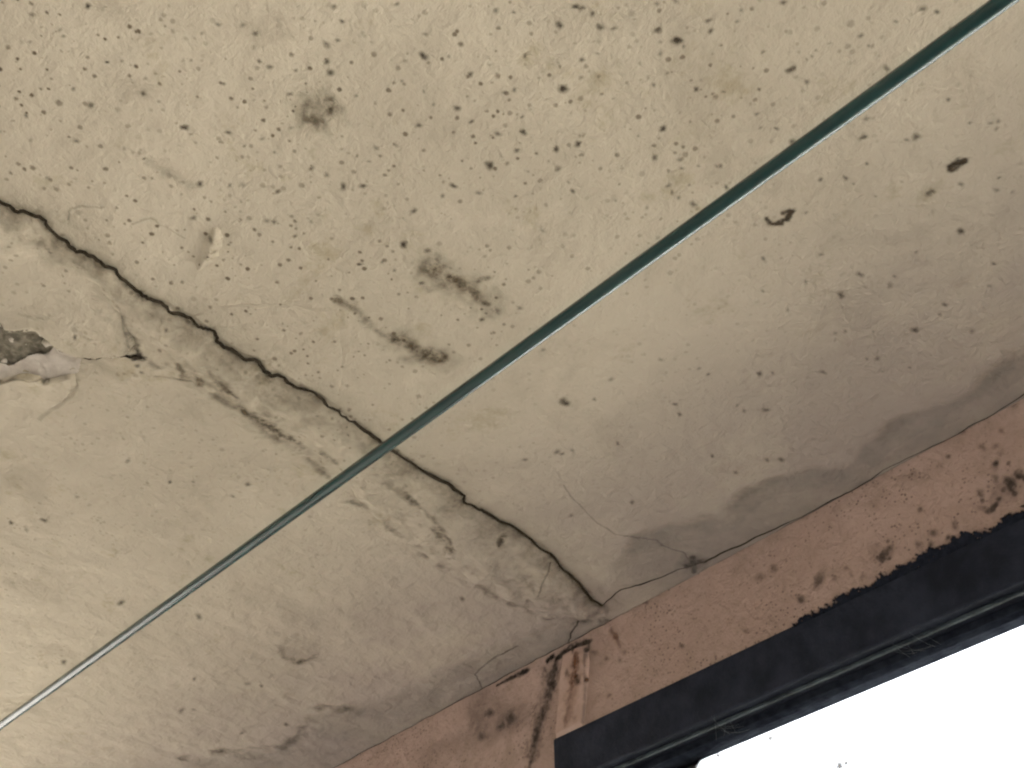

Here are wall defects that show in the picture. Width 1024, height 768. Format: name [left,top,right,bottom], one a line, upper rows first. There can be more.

flaking render [0,294,145,446]
water stain [392,335,448,363]
water stain [420,267,498,311]
crack [0,200,1024,768]
mould [987,472,1024,514]
water stain [529,639,591,765]